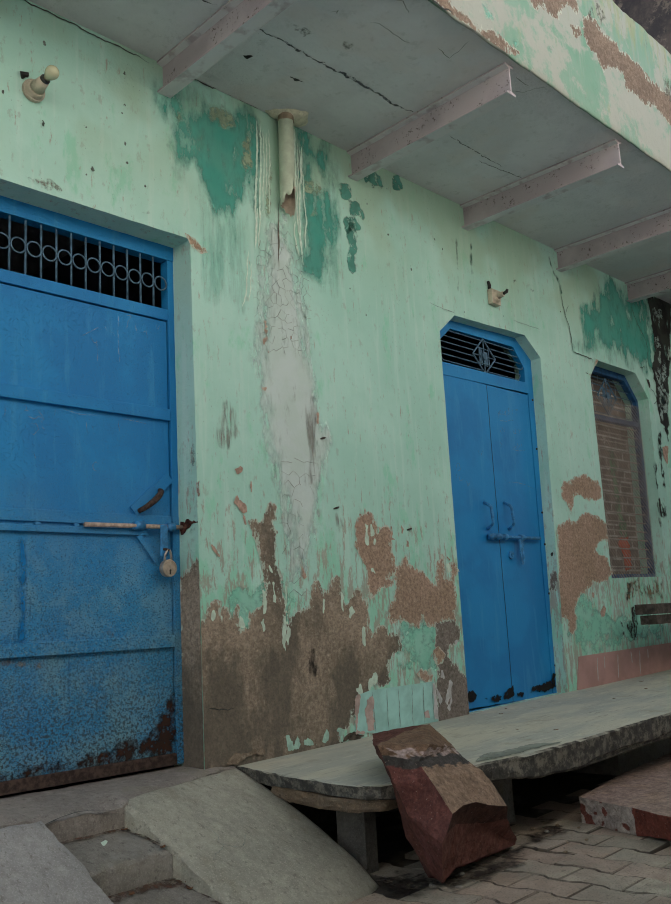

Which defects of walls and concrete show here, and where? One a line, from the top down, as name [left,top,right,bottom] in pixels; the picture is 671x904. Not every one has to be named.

crack [259,29,413,112]
peeling [435,0,520,56]
peeling [530,0,671,126]
flaking render [185,233,208,254]
crack [255,203,311,356]
corrosion [180,519,198,535]
peeling [549,474,613,635]
peeling [180,496,556,769]
corrosion [77,694,176,768]